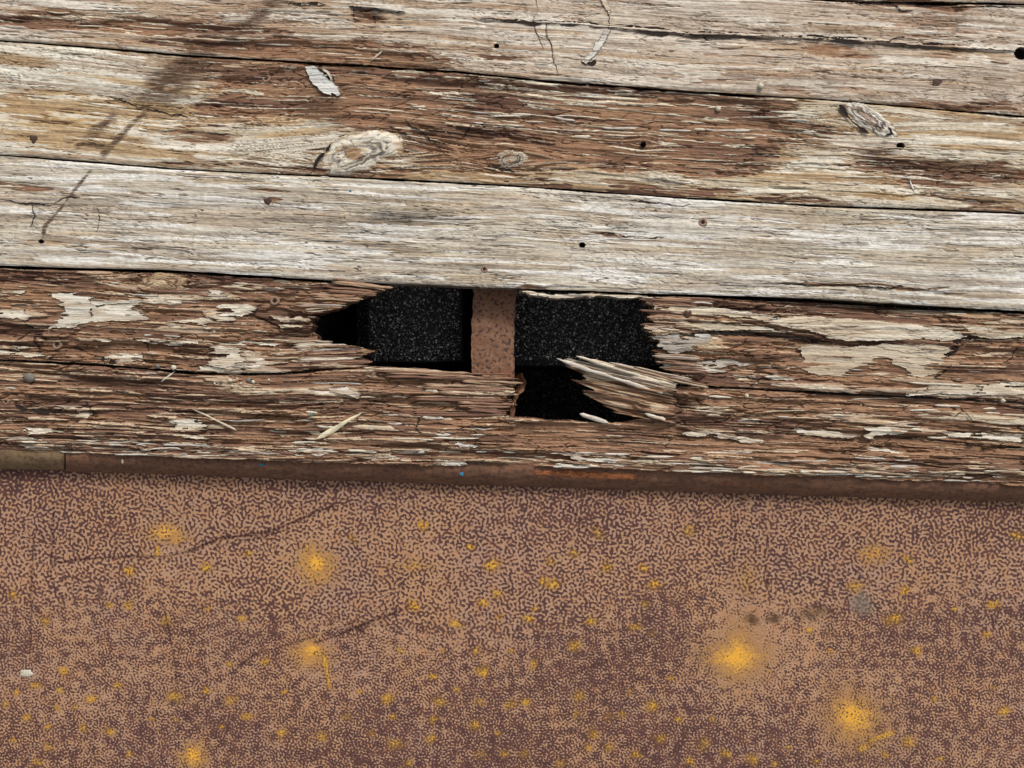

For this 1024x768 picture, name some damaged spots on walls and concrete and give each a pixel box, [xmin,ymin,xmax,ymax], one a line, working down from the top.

peeling [48,293,149,329]
peeling [166,289,258,326]
peeling [137,338,279,376]
peeling [649,306,1024,396]
peeling [164,408,210,439]
peeling [780,426,909,453]
corrosion [533,470,636,480]
corrosion [148,524,185,557]
corrosion [298,543,339,587]
corrosion [290,639,332,689]
corrosion [704,618,776,685]
corrosion [826,689,917,758]